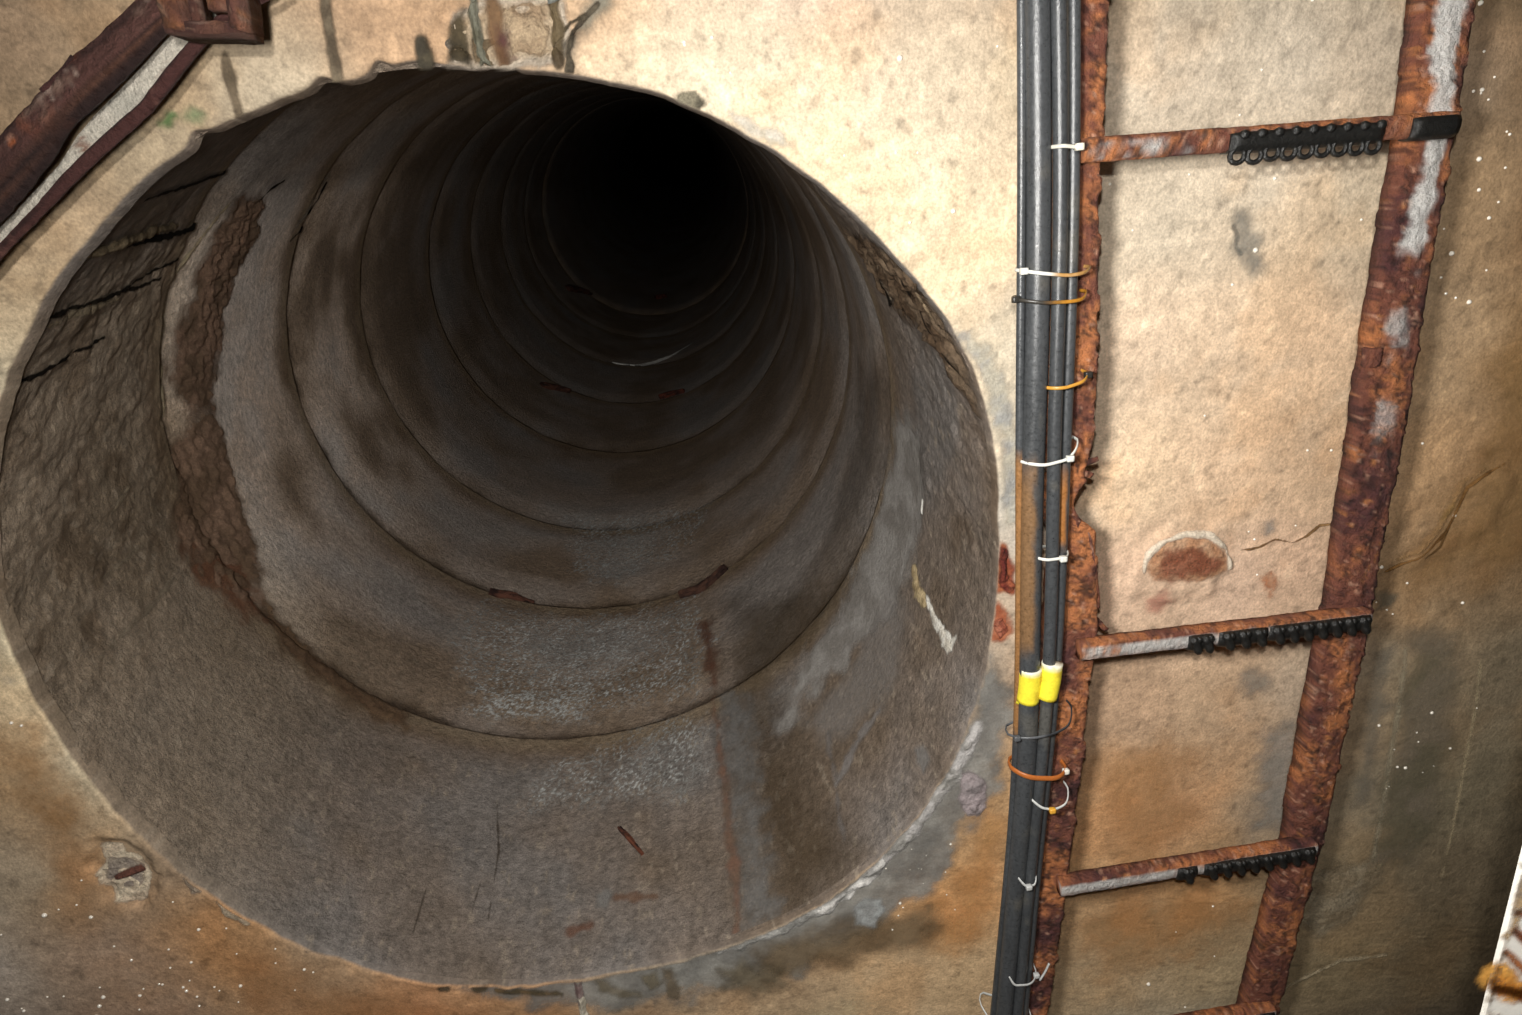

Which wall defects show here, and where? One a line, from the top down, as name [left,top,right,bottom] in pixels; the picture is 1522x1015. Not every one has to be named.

spalling [843,232,977,416]
water stain [779,416,957,731]
corrosion [992,544,1015,641]
crack [1385,463,1505,572]
spalling [96,841,152,902]
water stain [473,672,1013,1015]
corrosion [1478,880,1522,1002]